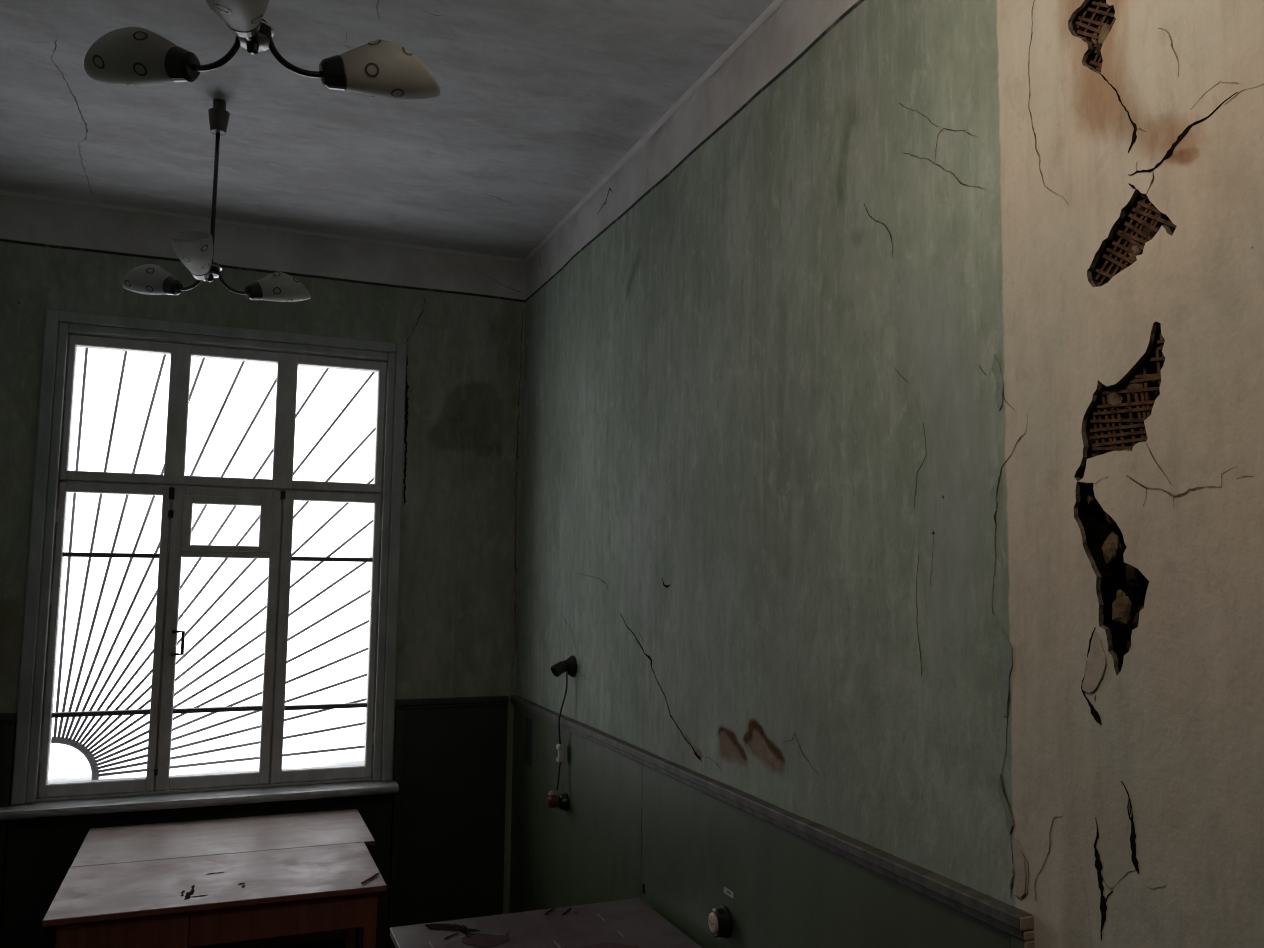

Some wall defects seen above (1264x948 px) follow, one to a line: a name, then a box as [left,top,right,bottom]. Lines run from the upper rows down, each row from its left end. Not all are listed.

crack [1028,2,1051,191]
spalling [1068,0,1116,74]
crack [1099,73,1264,194]
spalling [1087,189,1177,287]
crack [994,436,1022,541]
spalling [1074,322,1165,693]
crack [1130,449,1226,497]
crack [620,613,722,771]
peeling [719,720,783,772]
crack [1081,627,1102,725]
crack [1002,718,1055,900]
crack [1094,781,1160,940]